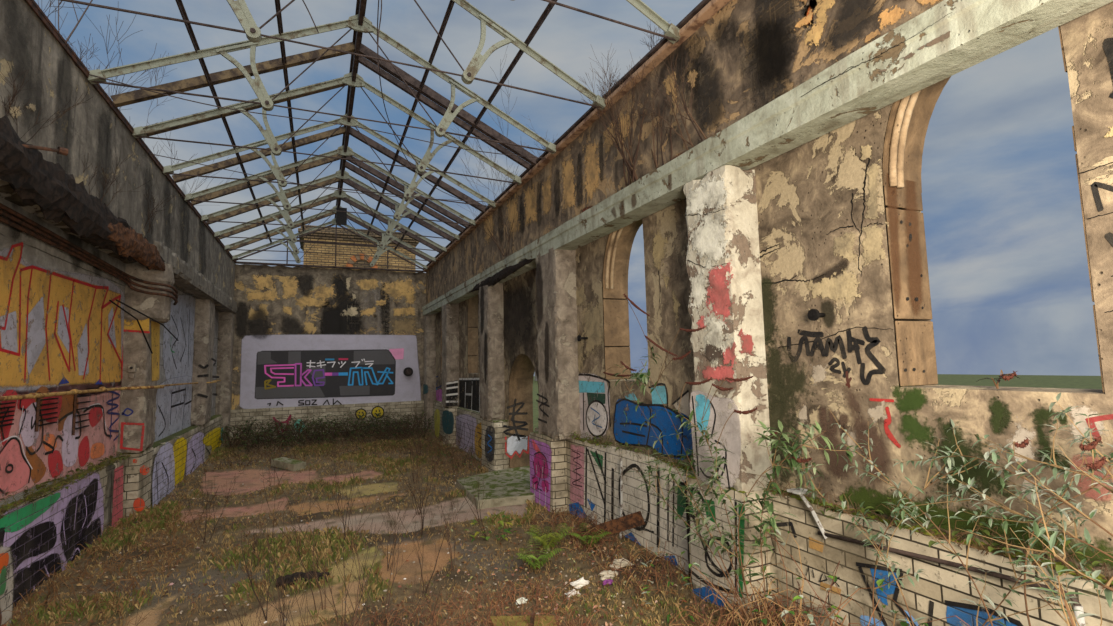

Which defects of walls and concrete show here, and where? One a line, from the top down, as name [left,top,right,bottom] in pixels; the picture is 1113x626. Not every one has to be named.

damp [716,0,796,104]
peeling [794,0,835,46]
damp [827,0,875,49]
peeling [865,0,939,42]
spalling [902,31,951,60]
peeling [662,68,698,102]
damp [670,42,723,128]
crack [827,148,883,277]
spalling [246,274,417,335]
peeling [652,174,754,383]